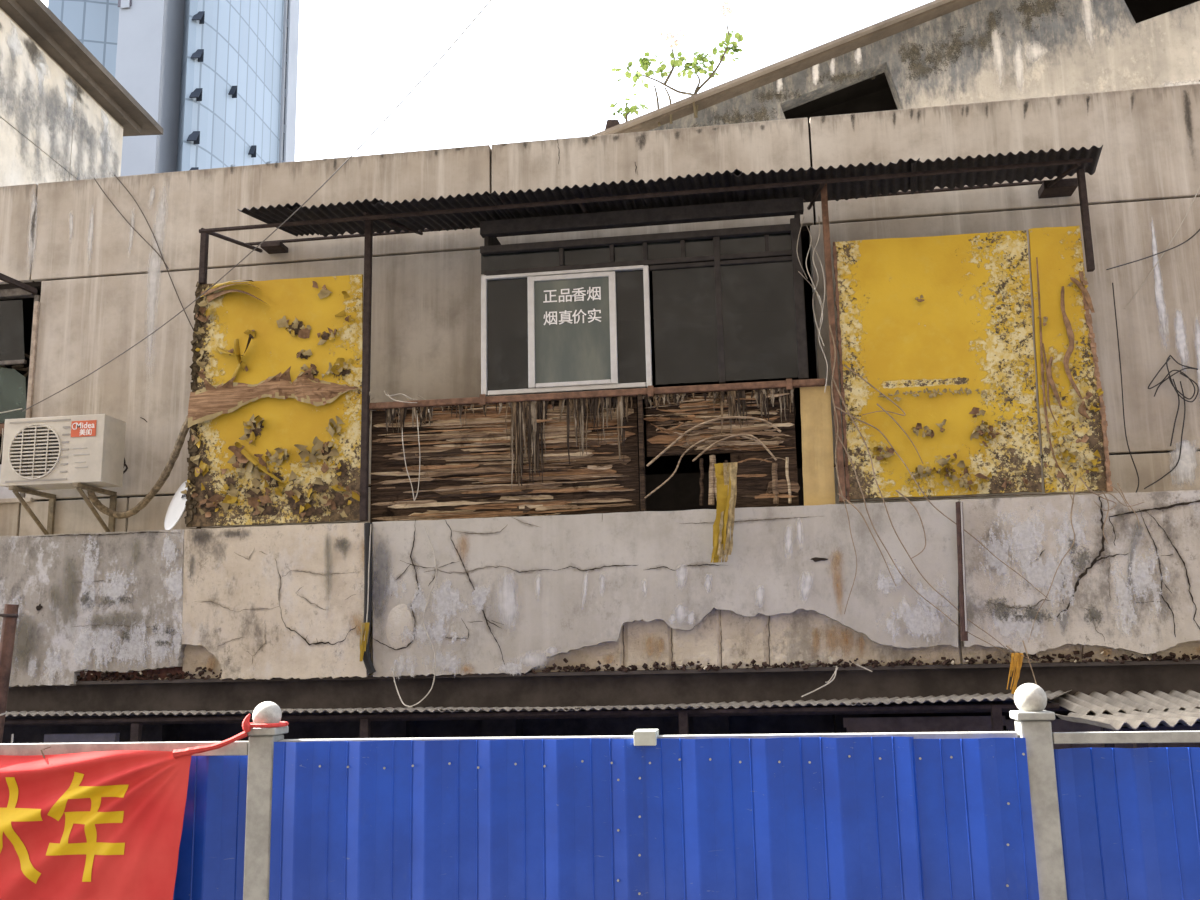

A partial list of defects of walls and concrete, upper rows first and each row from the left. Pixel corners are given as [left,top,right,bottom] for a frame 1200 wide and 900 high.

water stain [898,0,1064,87]
water stain [1083,0,1092,41]
water stain [0,25,117,180]
peeling [276,281,356,390]
peeling [878,269,1033,491]
water stain [52,563,130,640]
peeling [0,532,222,683]
peeling [181,414,360,520]
crack [206,517,728,665]
crack [679,516,816,524]
spalling [498,505,1200,676]
water stain [1127,524,1143,601]